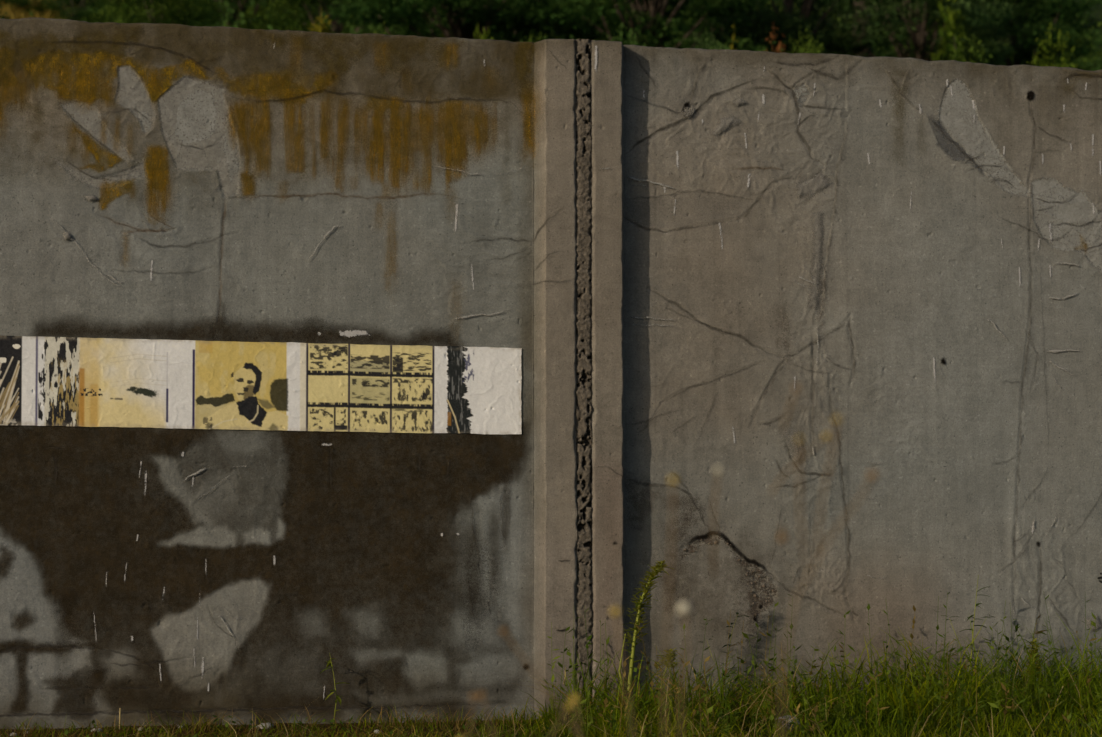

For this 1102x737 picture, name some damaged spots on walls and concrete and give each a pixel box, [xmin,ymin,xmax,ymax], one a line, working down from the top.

crack [637,87,735,143]
crack [781,61,850,134]
peeling [930,78,1102,271]
water stain [0,425,527,720]
crack [688,531,765,569]
crack [796,433,850,567]